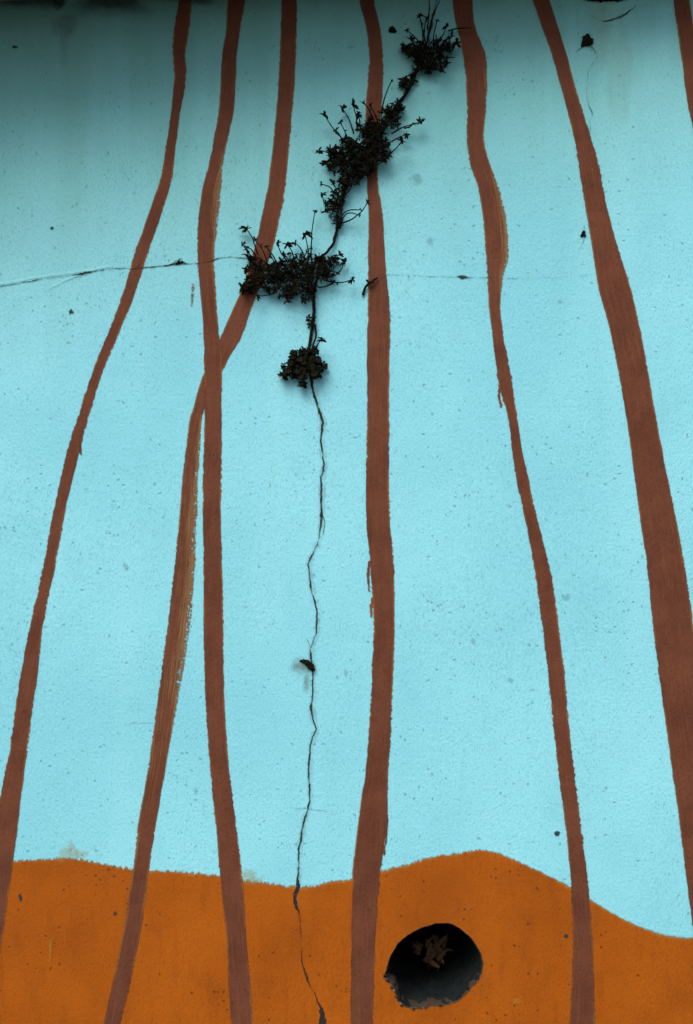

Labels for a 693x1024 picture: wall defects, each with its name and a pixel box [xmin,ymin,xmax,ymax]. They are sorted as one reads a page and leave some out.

crack [368,9,435,148]
crack [0,256,259,290]
crack [293,259,326,1024]